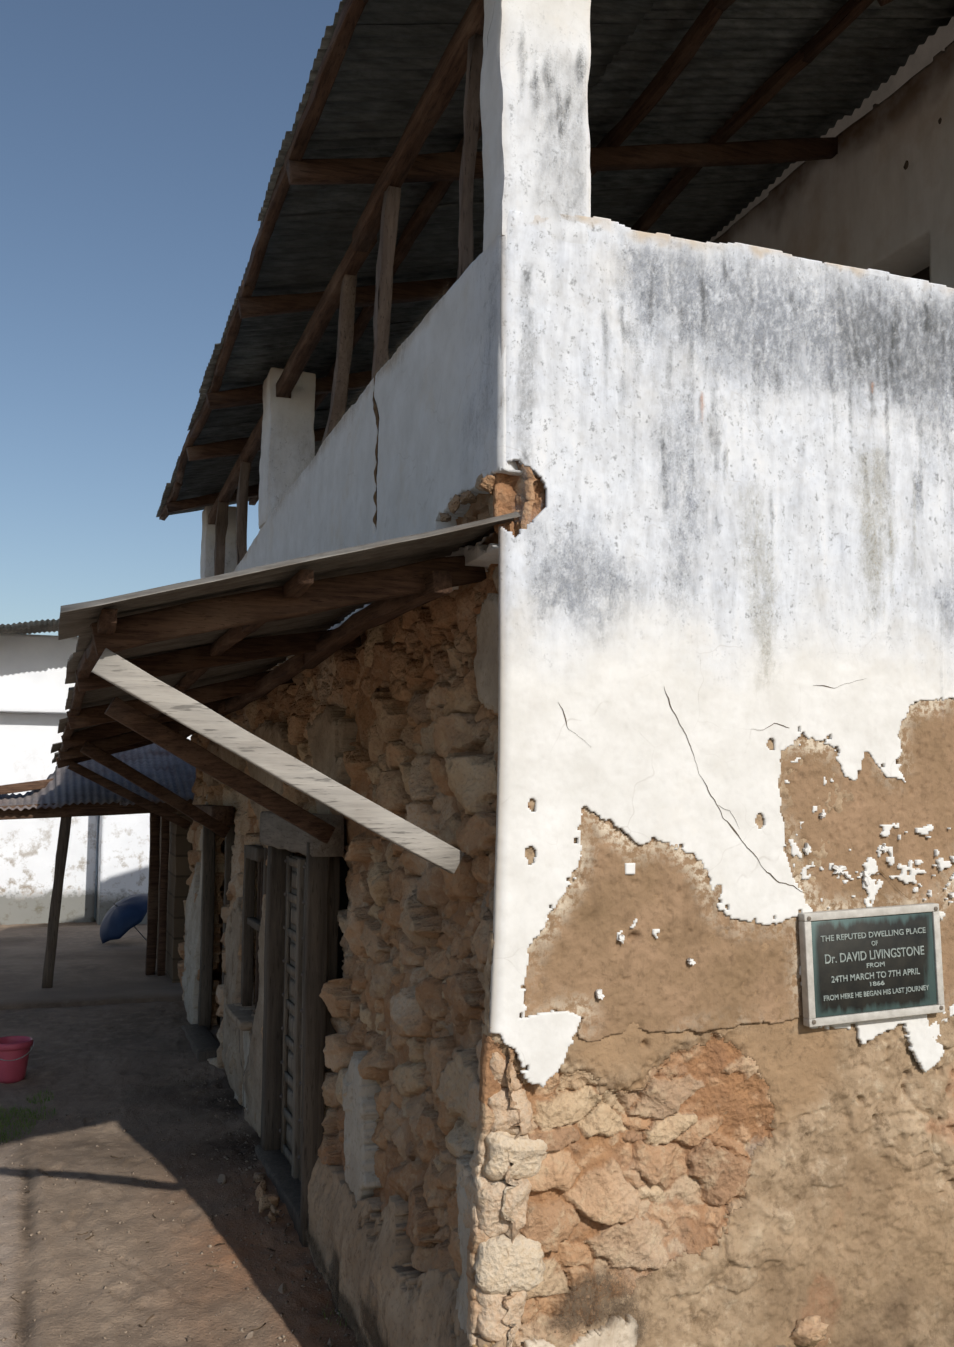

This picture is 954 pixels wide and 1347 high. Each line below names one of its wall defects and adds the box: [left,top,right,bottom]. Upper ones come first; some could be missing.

damp [630,252,954,428]
crack [372,375,380,526]
spalling [439,461,545,545]
damp [542,543,627,607]
spalling [190,732,218,751]
crack [664,688,806,893]
spalling [177,768,268,1069]
spalling [224,564,954,1347]
damp [305,1224,387,1347]